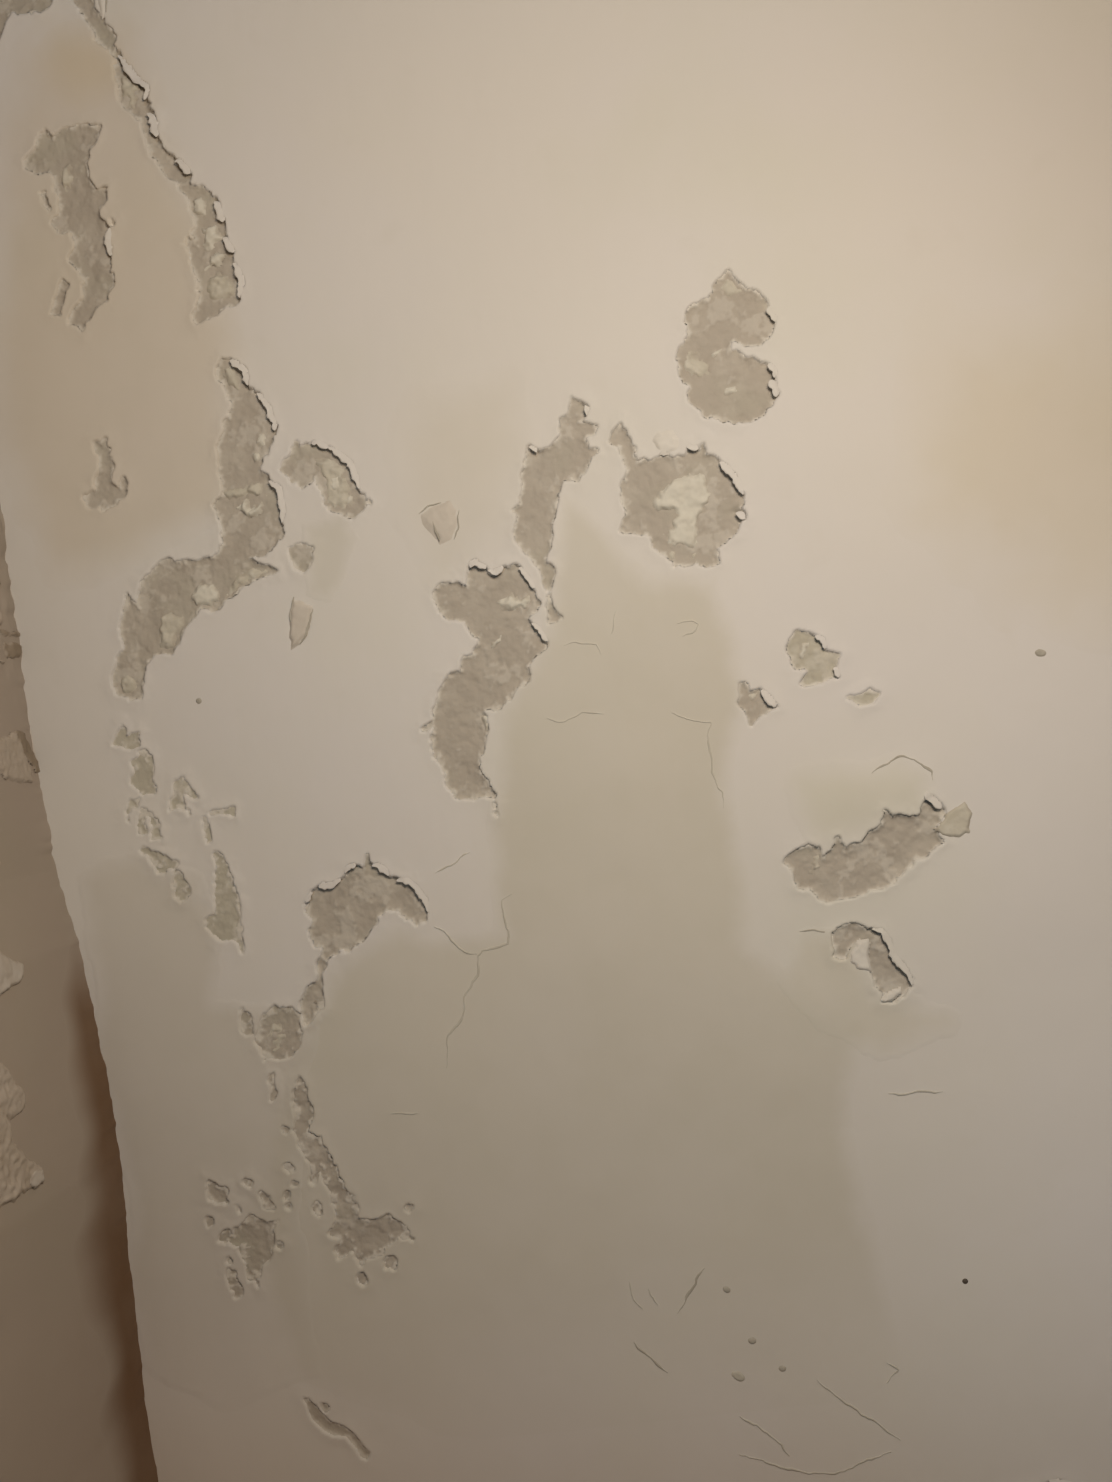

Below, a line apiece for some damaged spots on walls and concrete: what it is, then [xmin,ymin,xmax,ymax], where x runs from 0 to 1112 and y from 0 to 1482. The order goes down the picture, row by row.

spalling [24,124,115,331]
spalling [73,0,245,325]
spalling [676,270,779,424]
spalling [113,359,372,701]
spalling [421,397,745,816]
spalling [112,726,245,954]
spalling [783,791,972,902]
spalling [206,853,429,1299]
crack [435,894,511,1068]
spalling [832,923,914,1003]
crack [629,1268,705,1373]
crack [739,1380,899,1475]